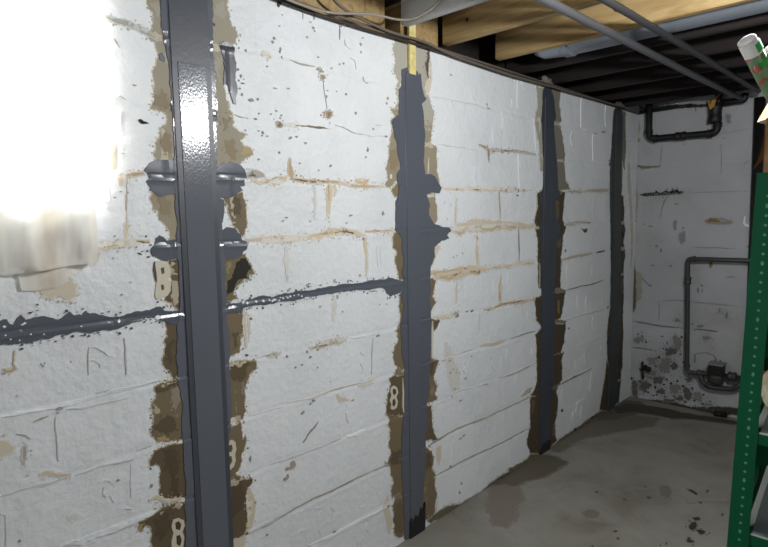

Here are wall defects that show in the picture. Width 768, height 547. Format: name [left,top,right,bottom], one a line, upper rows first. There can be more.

peeling [160,259,180,311]
peeling [392,229,404,281]
peeling [382,38,440,198]
peeling [427,193,452,224]
peeling [534,84,570,447]
peeling [135,322,186,547]
peeling [227,308,257,547]
damp [484,314,737,529]